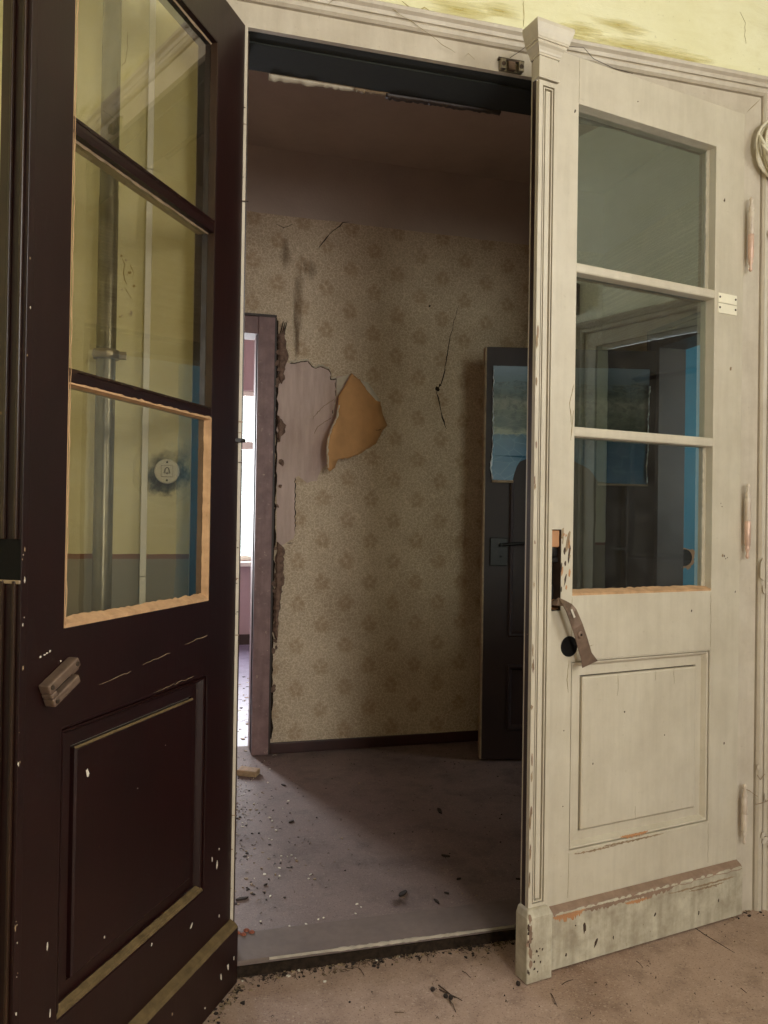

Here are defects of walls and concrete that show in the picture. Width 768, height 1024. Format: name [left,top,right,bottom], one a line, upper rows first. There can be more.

flaking render [270,320,349,739]
crack [436,308,458,429]